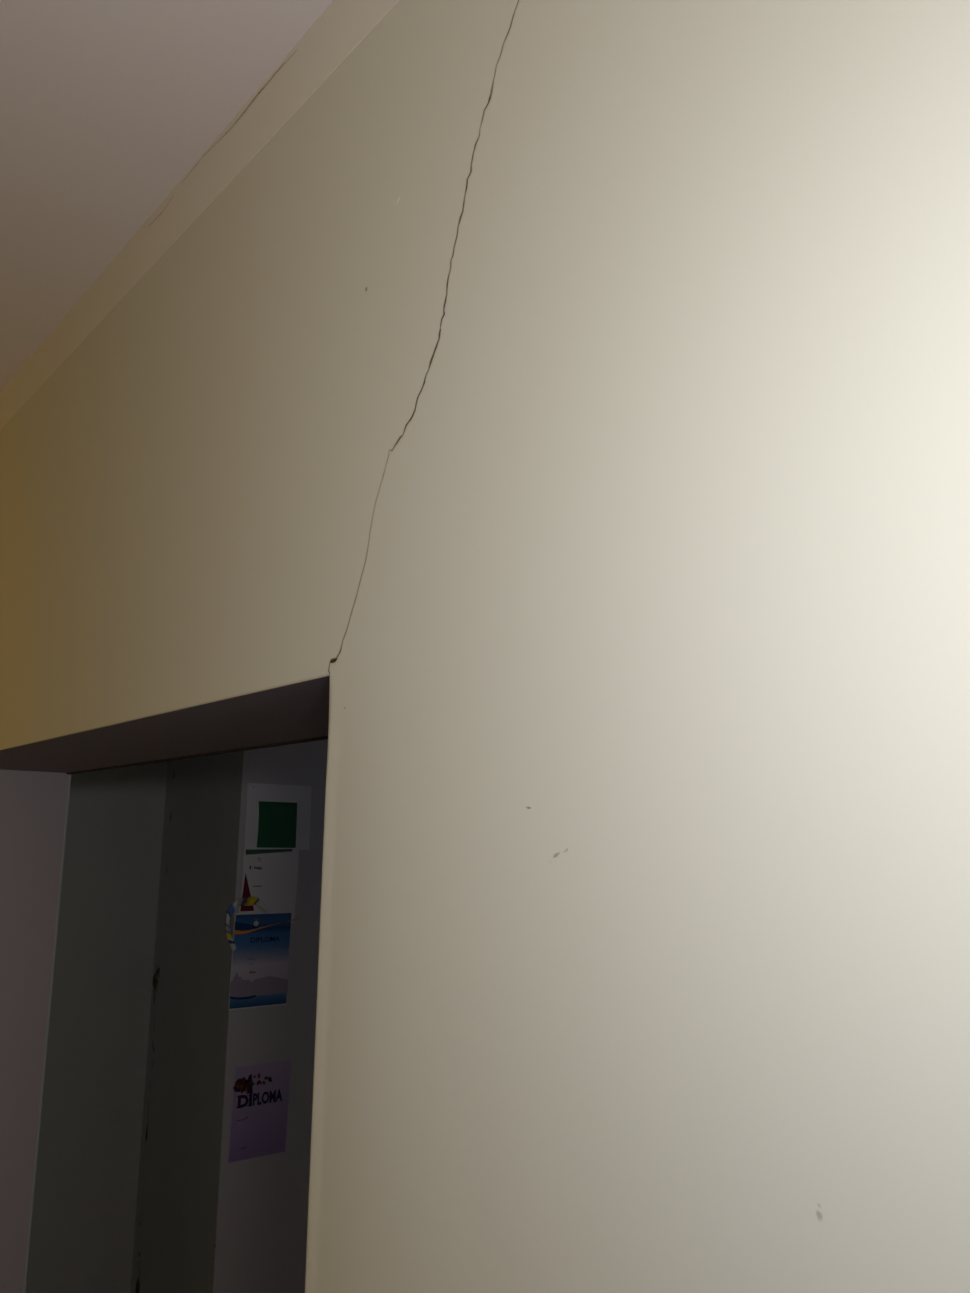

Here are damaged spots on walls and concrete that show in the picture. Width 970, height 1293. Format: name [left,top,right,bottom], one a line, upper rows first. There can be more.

crack [393,0,519,449]